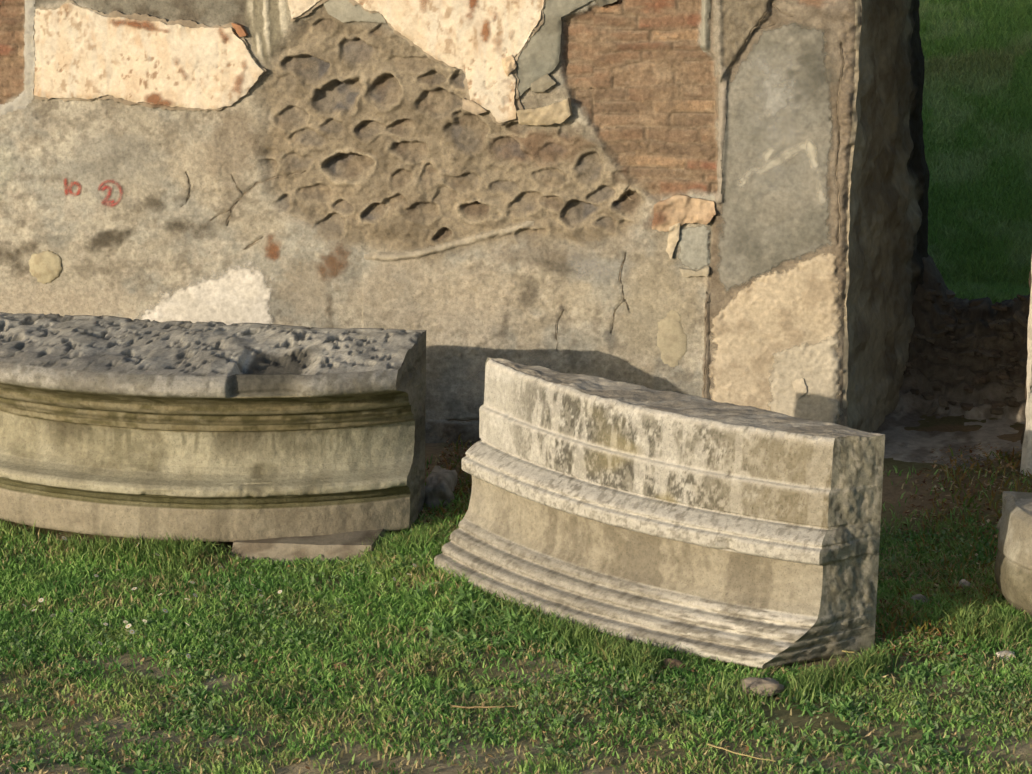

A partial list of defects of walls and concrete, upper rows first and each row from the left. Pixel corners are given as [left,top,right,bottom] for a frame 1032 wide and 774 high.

crack [210,170,306,223]
rust [266,243,279,259]
spalling [0,0,843,424]
crack [610,252,628,333]